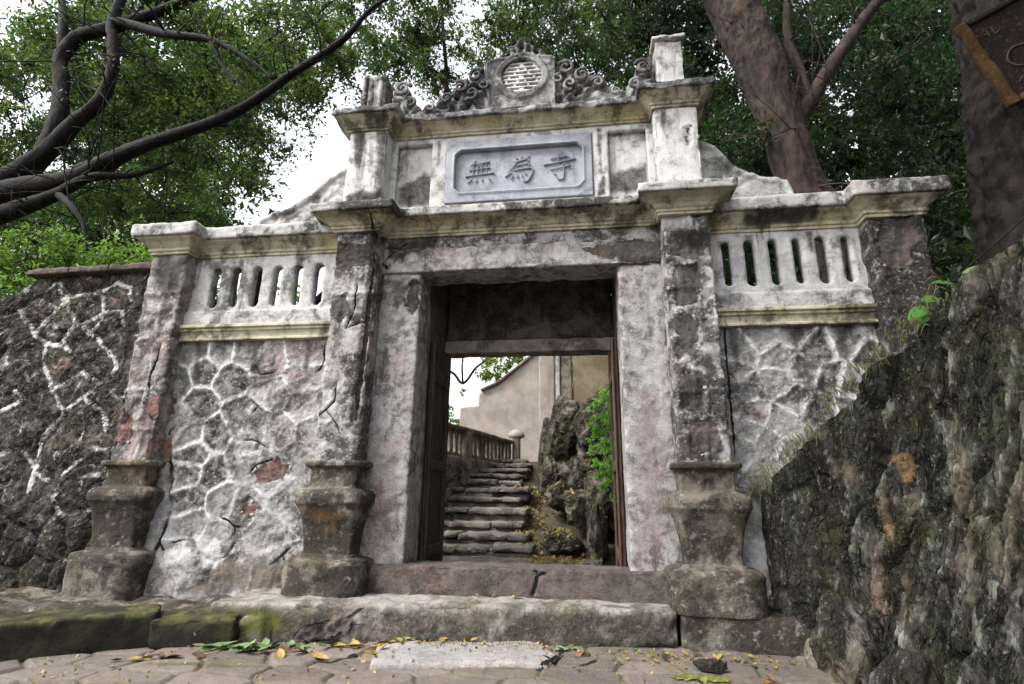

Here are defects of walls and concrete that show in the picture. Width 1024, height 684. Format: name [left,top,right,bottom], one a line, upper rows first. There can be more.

crack [317,203,405,436]
spalling [142,393,176,415]
crack [724,318,735,456]
spalling [112,407,133,446]
spalling [142,435,173,462]
crack [144,345,186,551]
spalling [250,455,293,484]
spalling [240,500,260,516]
crack [219,517,241,560]
crack [531,568,545,595]